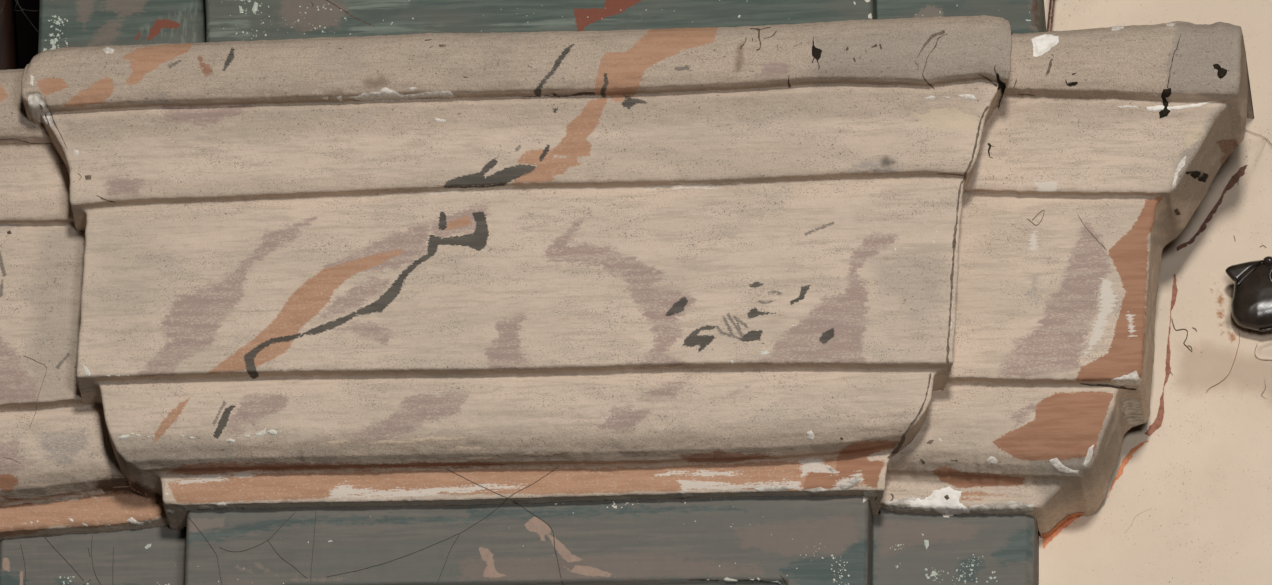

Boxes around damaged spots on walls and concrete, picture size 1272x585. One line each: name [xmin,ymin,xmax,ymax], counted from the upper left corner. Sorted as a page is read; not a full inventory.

crack [887,65,1035,458]
flaking render [1042,512,1084,548]
peeling [1049,445,1094,474]
peeling [1080,274,1178,498]